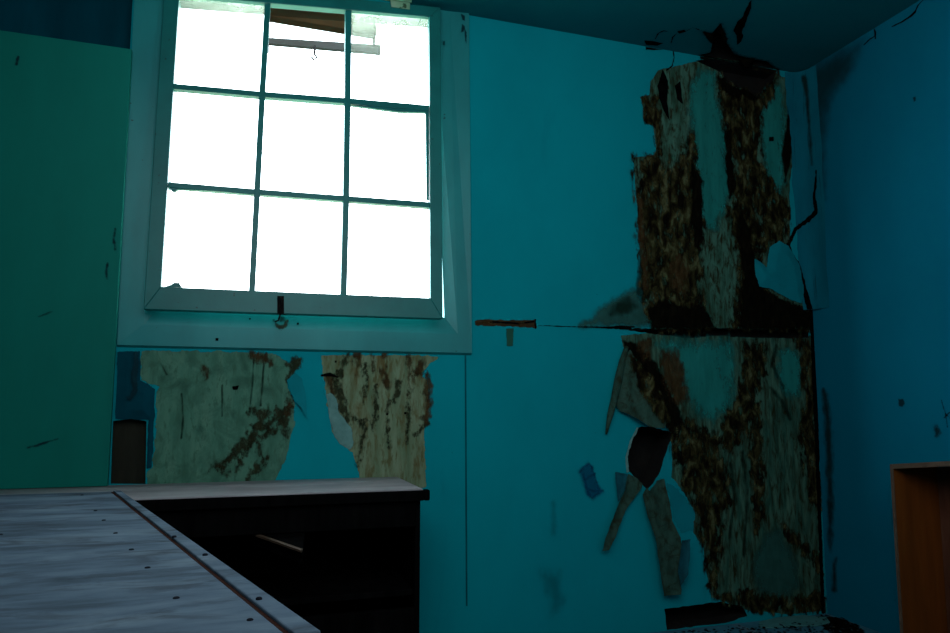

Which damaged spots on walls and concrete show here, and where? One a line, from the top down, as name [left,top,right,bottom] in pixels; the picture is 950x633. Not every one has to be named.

crack [733,1,751,45]
crack [786,170,818,311]
crack [539,323,635,331]
peeling [621,23,827,617]
peeling [140,350,301,484]
peeling [321,352,438,488]